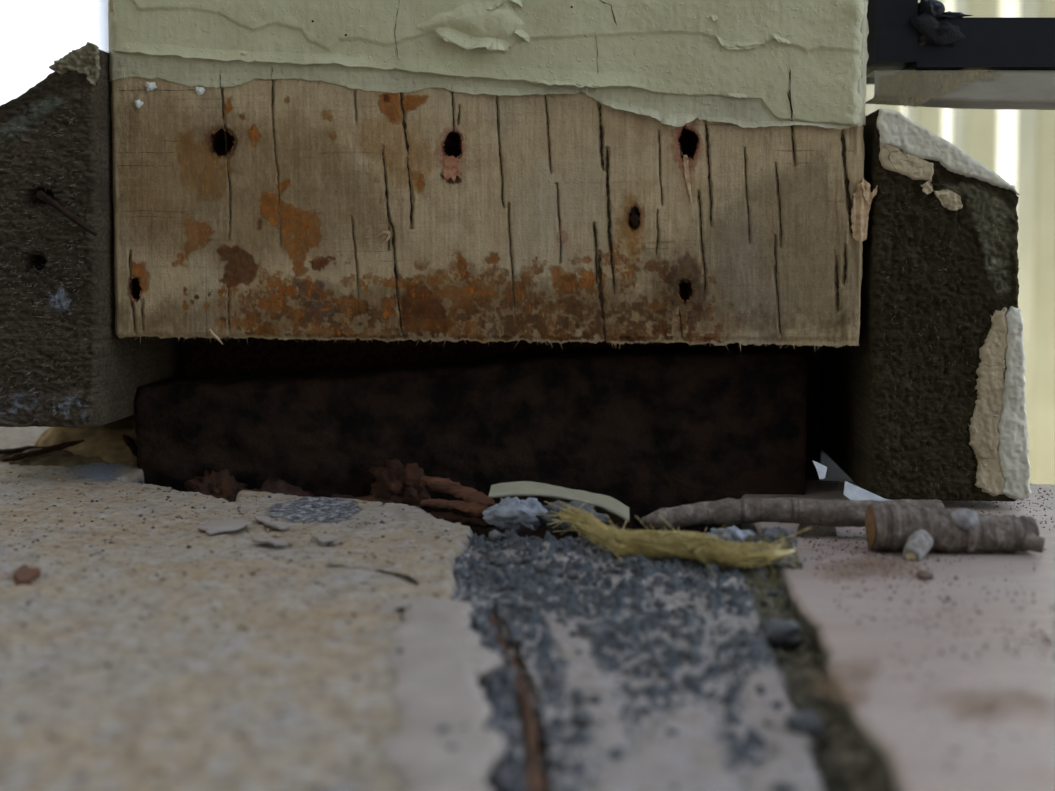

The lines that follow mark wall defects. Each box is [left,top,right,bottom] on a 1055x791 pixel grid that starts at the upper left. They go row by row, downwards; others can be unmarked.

rust [132,262,148,292]
crack [382,93,413,331]
rust [378,93,428,123]
rust [173,180,722,343]
rust [437,145,461,184]
peeling [114,42,860,130]
crack [593,104,615,341]
crack [698,123,712,292]
crack [835,134,853,311]
peeling [876,108,1032,501]
peeling [812,460,827,479]
peeling [843,481,888,501]